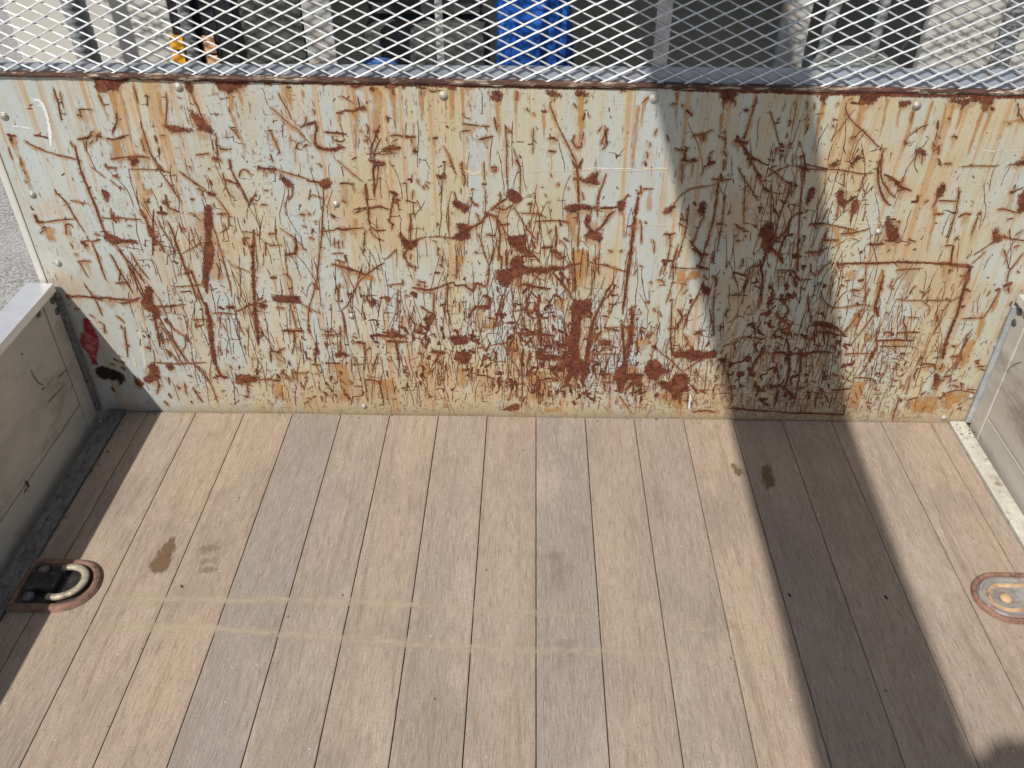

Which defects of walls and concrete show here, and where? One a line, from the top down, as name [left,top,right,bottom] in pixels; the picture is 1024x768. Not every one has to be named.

corrosion [71,78,1024,413]
damp [762,464,774,489]
damp [148,537,175,573]